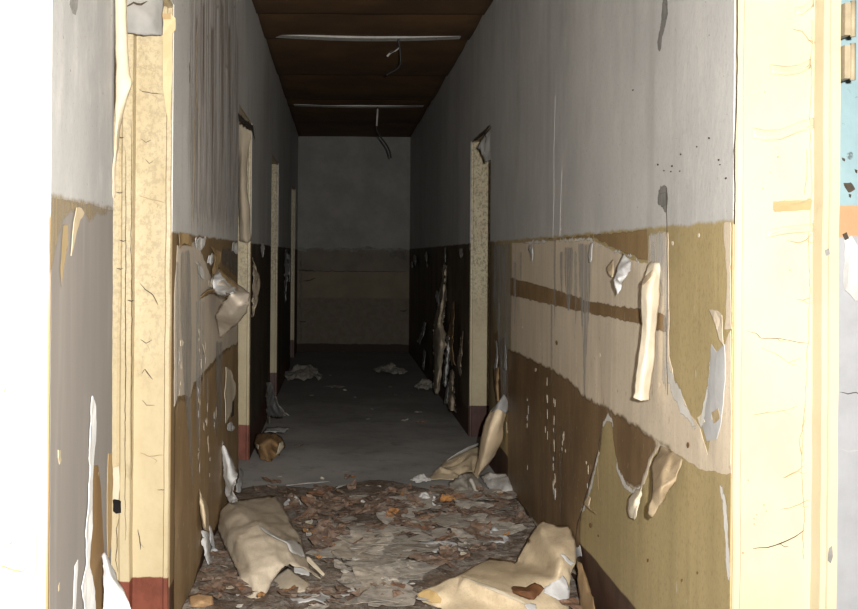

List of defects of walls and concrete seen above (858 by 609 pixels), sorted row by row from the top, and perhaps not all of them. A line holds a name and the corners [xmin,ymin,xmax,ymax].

peeling [511,230,732,519]